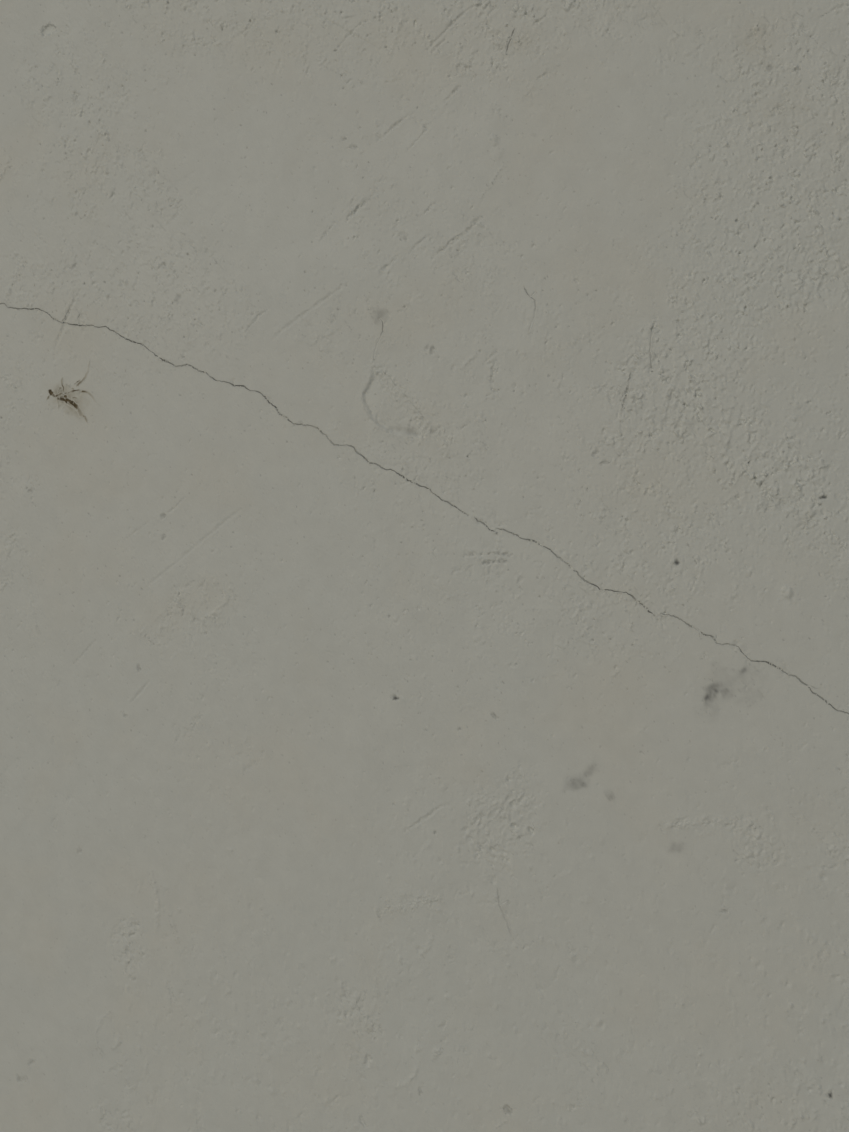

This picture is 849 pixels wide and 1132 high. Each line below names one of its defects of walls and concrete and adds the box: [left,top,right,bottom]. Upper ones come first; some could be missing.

crack [0,302,849,715]